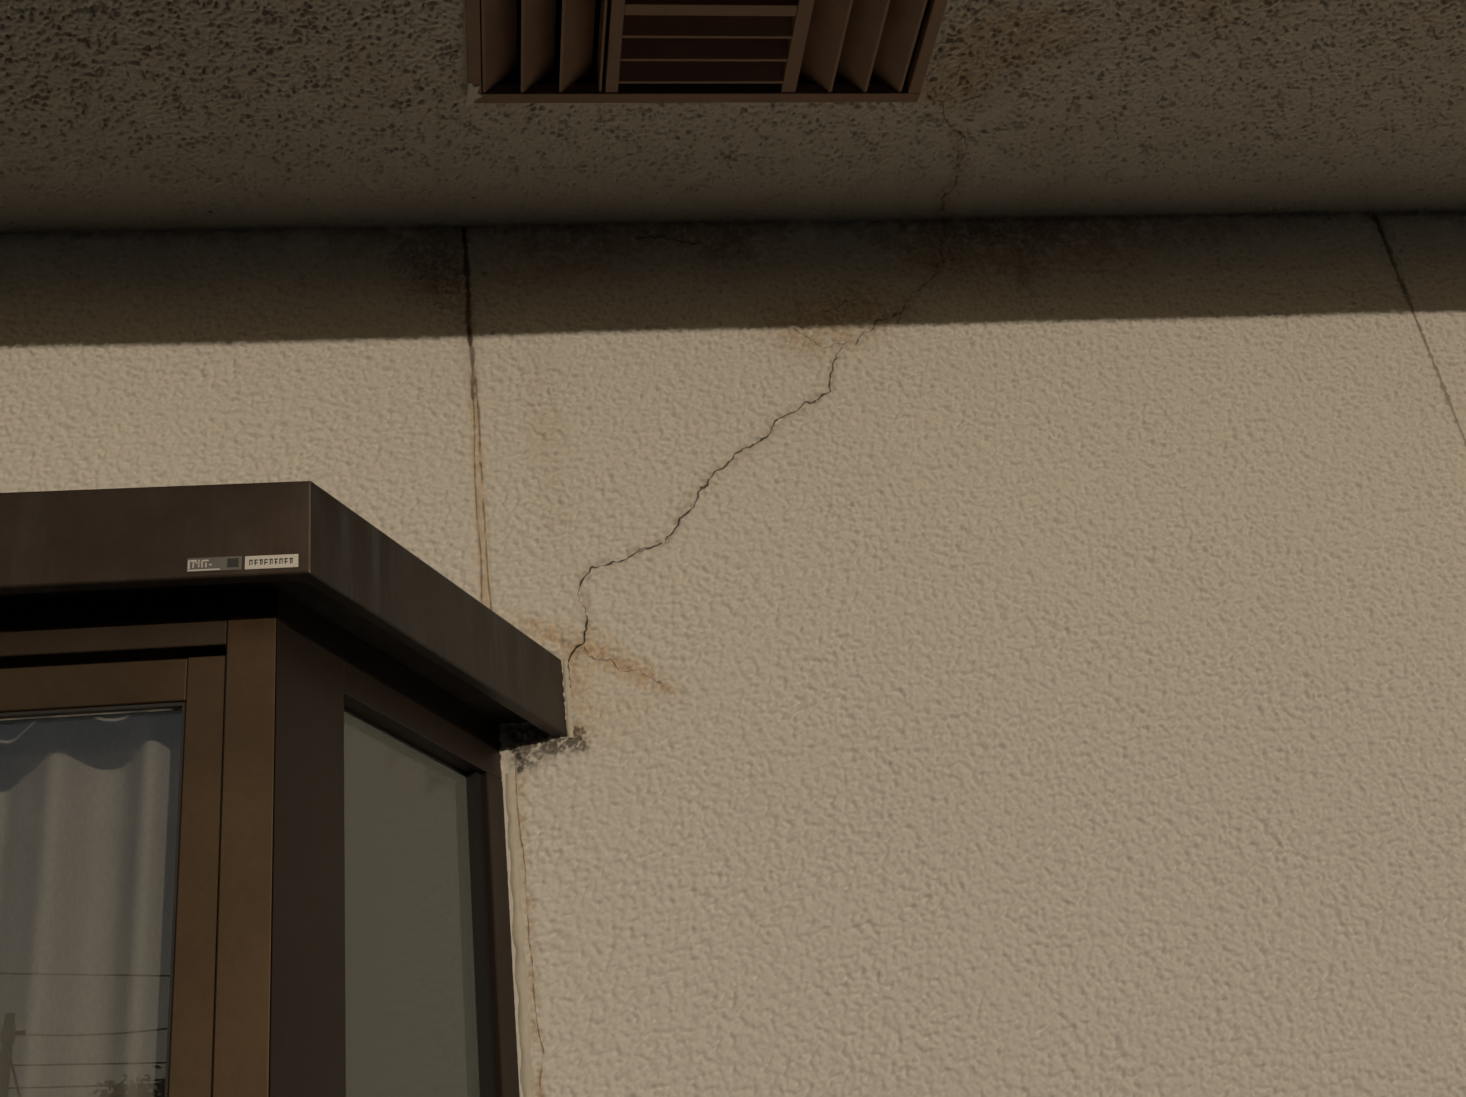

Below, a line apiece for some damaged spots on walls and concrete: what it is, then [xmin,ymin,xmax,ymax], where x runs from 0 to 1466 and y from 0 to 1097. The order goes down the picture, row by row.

crack [567,300,907,688]
leakage [511,728,585,771]